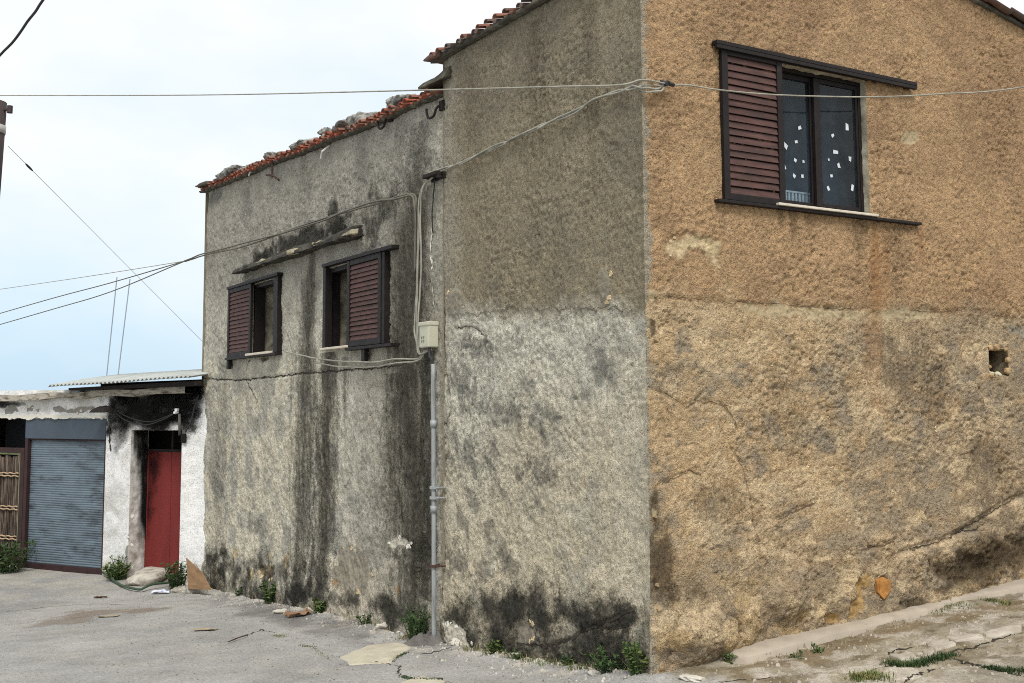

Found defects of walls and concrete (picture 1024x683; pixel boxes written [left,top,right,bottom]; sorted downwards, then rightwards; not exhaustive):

leakage [203,153,434,631]
spalling [387,535,413,549]
crack [865,495,1024,552]
leakage [934,537,1024,590]
leakage [440,576,649,669]